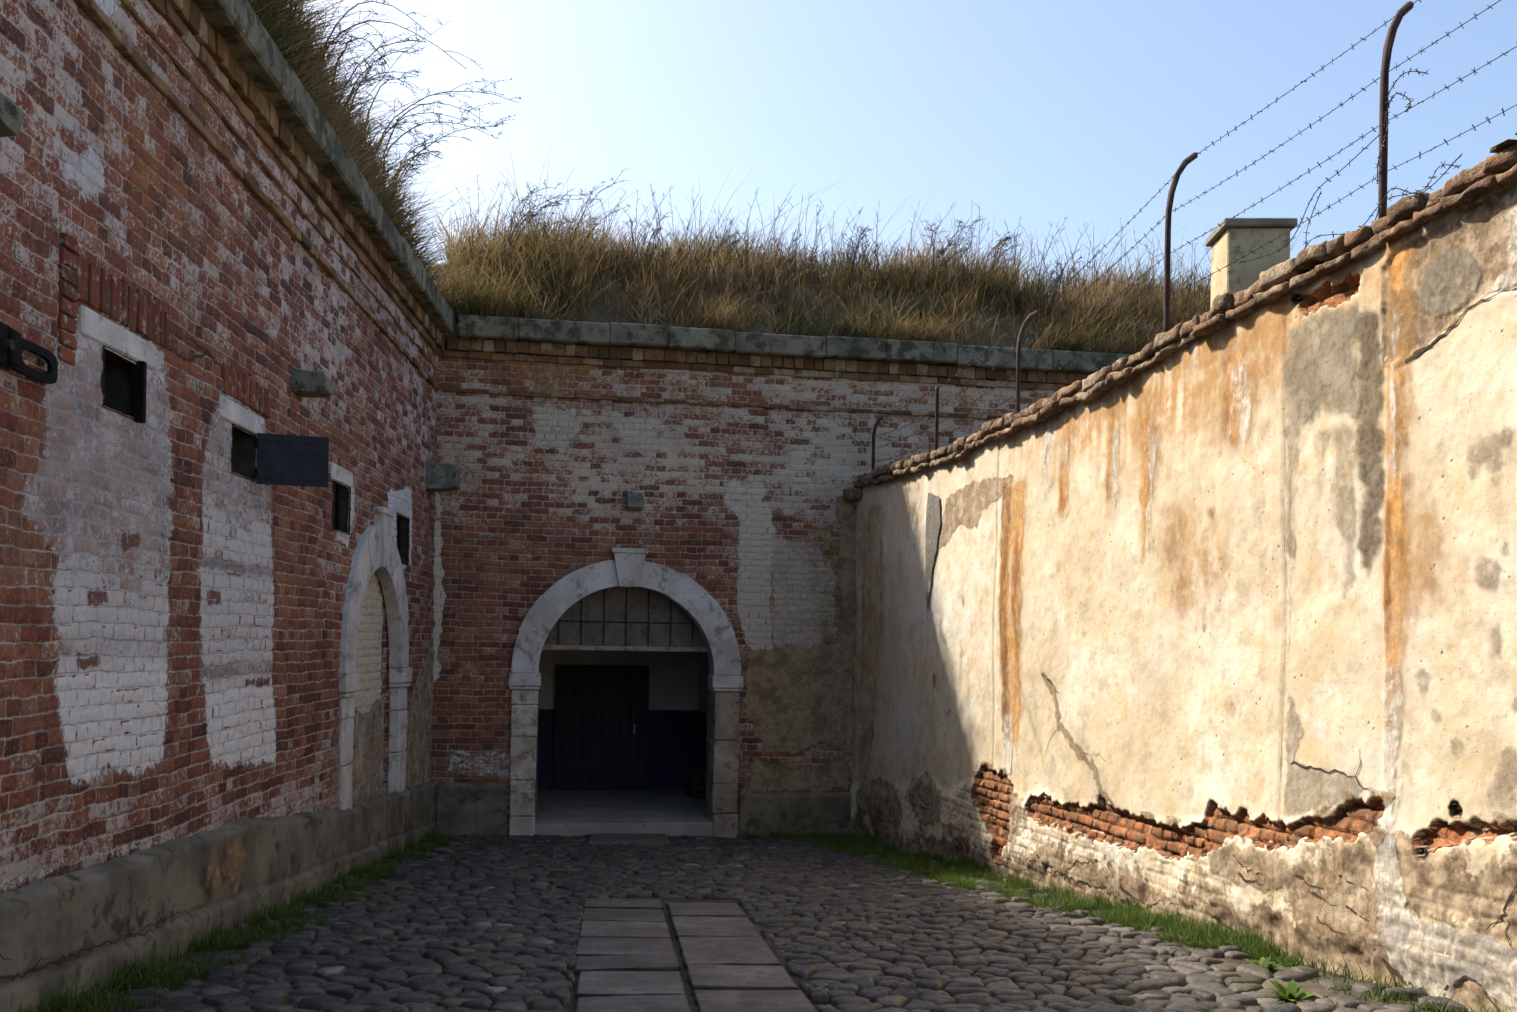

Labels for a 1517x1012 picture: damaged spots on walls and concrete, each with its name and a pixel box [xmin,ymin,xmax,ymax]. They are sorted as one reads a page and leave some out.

spalling [1299,274,1361,316]
crack [1405,285,1517,363]
water stain [1286,434,1297,557]
water stain [1320,424,1356,583]
corrosion [1381,239,1439,808]
corrosion [999,481,1025,774]
crack [1041,672,1114,806]
spalling [856,748,1395,962]
spalling [1412,811,1517,852]
crack [1484,883,1517,957]